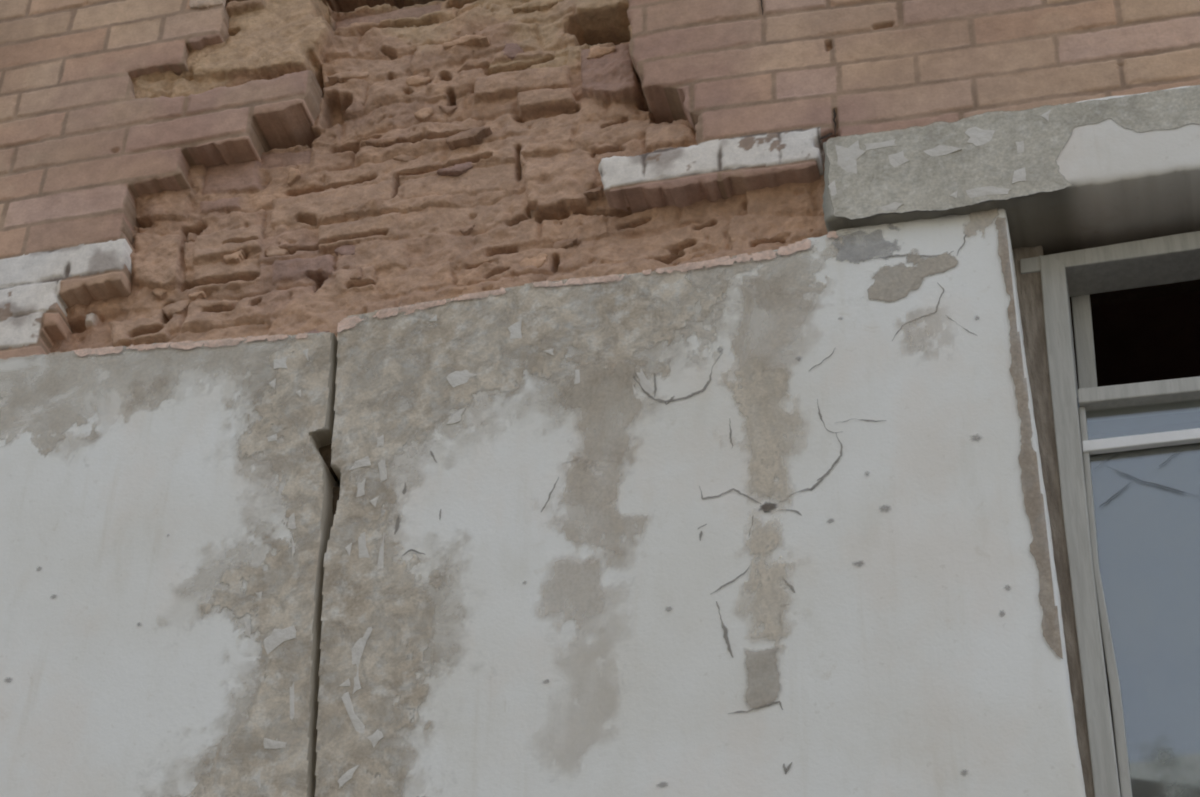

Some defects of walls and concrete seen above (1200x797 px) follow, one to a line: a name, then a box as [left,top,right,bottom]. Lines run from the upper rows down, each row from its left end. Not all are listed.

peeling [826,85,1200,219]
water stain [71,333,308,357]
spalling [0,0,828,797]
water stain [337,287,506,332]
water stain [533,274,625,287]
crack [633,356,720,405]
water stain [642,239,811,275]
water stain [724,277,808,510]
crack [698,347,886,541]
peeling [868,252,958,302]
crack [711,566,750,658]
water stain [745,522,791,708]